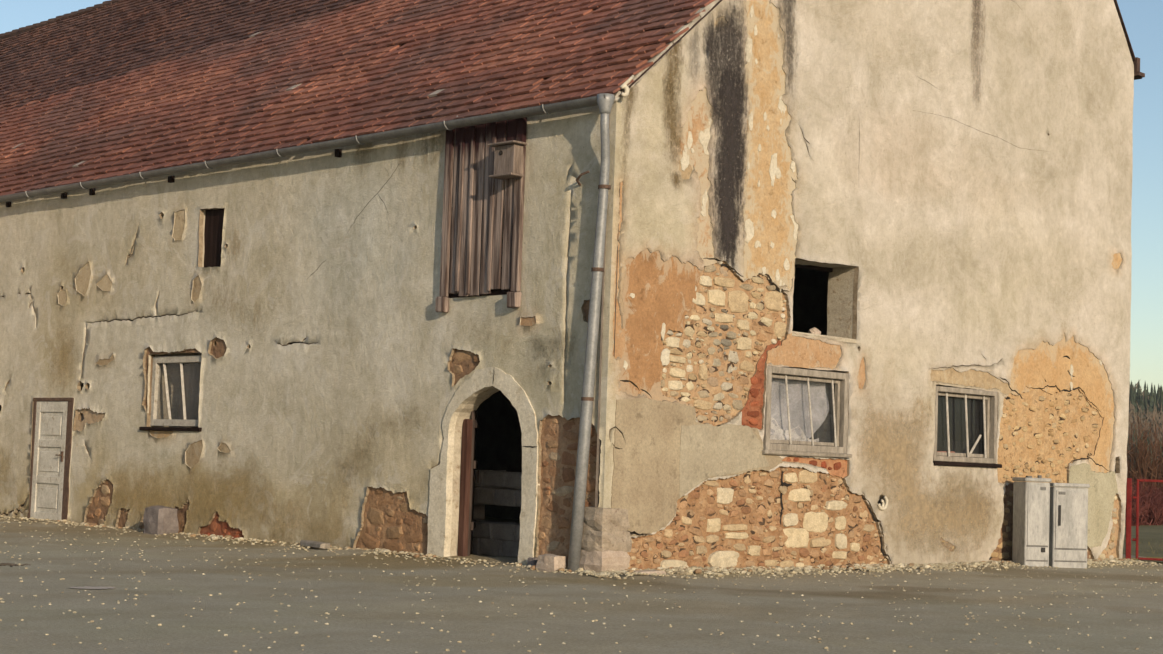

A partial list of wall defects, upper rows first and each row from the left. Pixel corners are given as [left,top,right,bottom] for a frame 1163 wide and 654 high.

water stain [706,6,748,266]
flaking render [740,0,798,293]
flaking render [739,332,841,430]
flaking render [930,336,1116,473]
flaking render [86,480,129,528]
flaking render [176,502,190,533]
flaking render [200,512,244,539]
flaking render [356,487,428,555]
flaking render [538,415,632,572]
flaking render [782,456,847,478]
flaking render [990,483,1014,561]